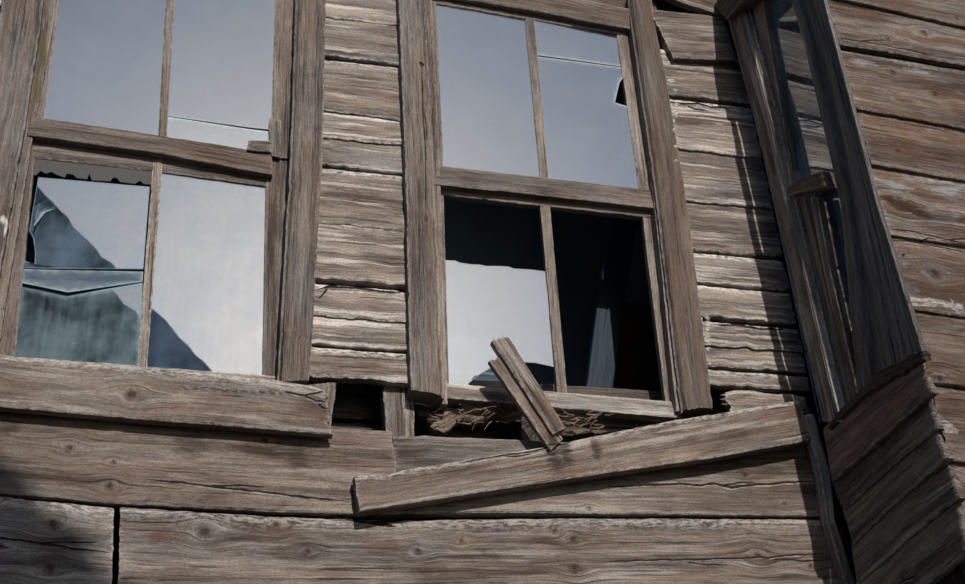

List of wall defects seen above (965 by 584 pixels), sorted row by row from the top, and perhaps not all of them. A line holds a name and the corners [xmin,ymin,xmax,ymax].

crack [608,477,817,491]
crack [150,479,398,529]
crack [0,537,110,553]